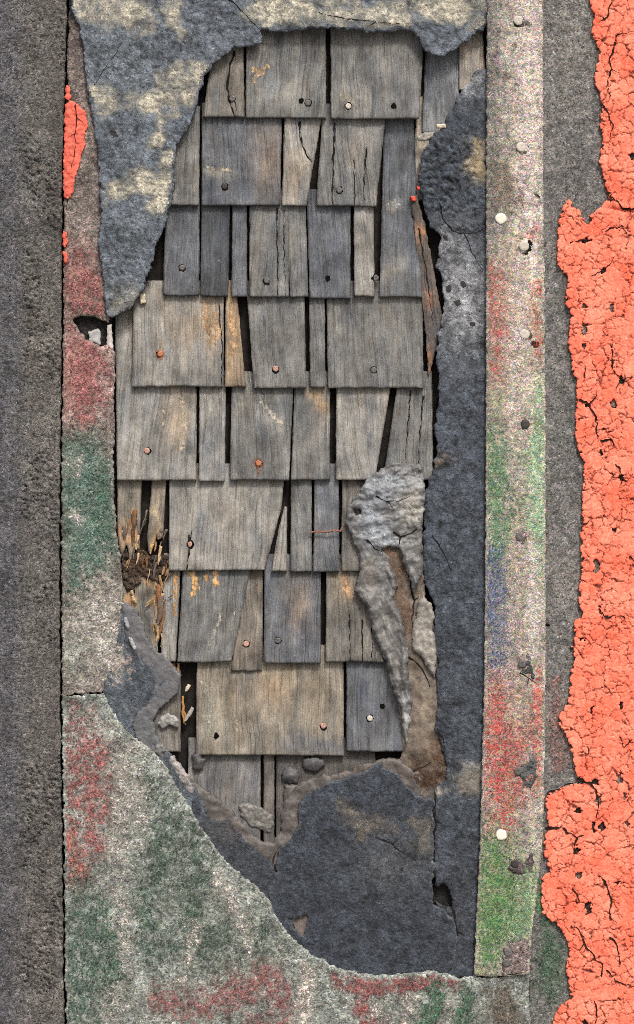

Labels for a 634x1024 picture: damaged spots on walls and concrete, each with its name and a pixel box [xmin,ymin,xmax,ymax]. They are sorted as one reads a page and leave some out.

crack [600,0,633,140]
peeling [417,124,446,141]
crack [570,192,634,243]
peeling [88,324,113,354]
crack [579,344,631,501]
crack [544,778,607,854]
crack [570,874,634,987]